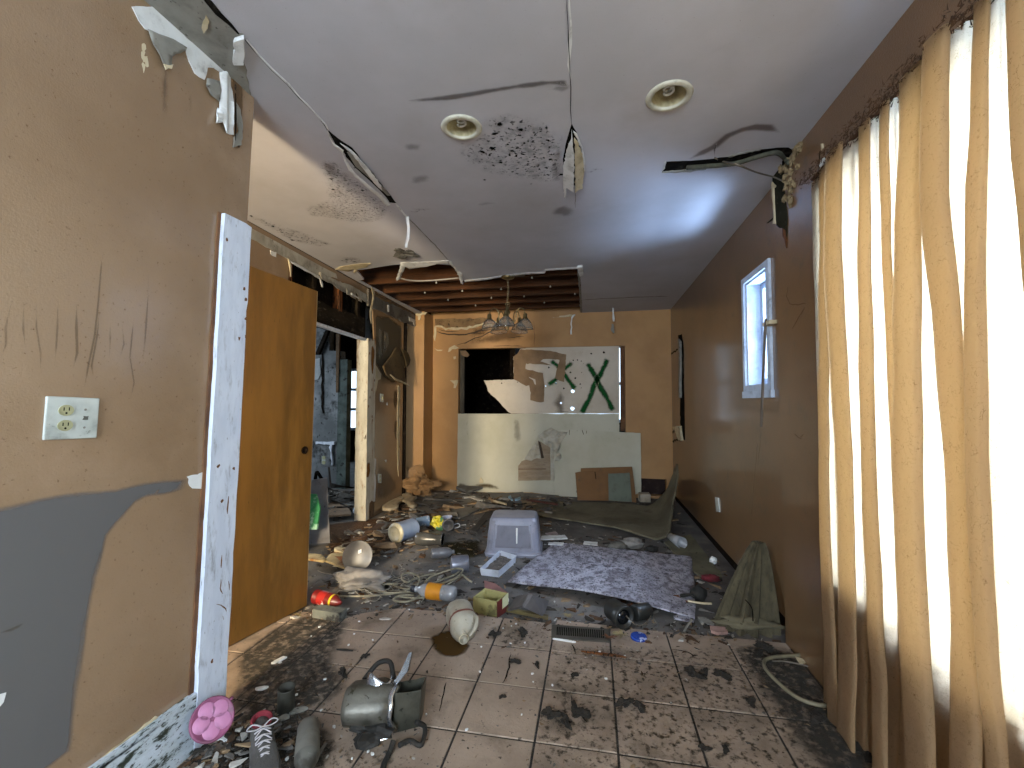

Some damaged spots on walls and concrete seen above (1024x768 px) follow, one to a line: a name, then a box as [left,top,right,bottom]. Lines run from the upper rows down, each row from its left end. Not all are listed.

flaking render [145,0,251,95]
crack [565,0,573,124]
crack [245,39,448,260]
leakage [468,117,563,176]
crack [662,147,792,248]
flaking render [407,312,487,359]
spalling [464,265,583,318]
peeling [103,716,158,757]